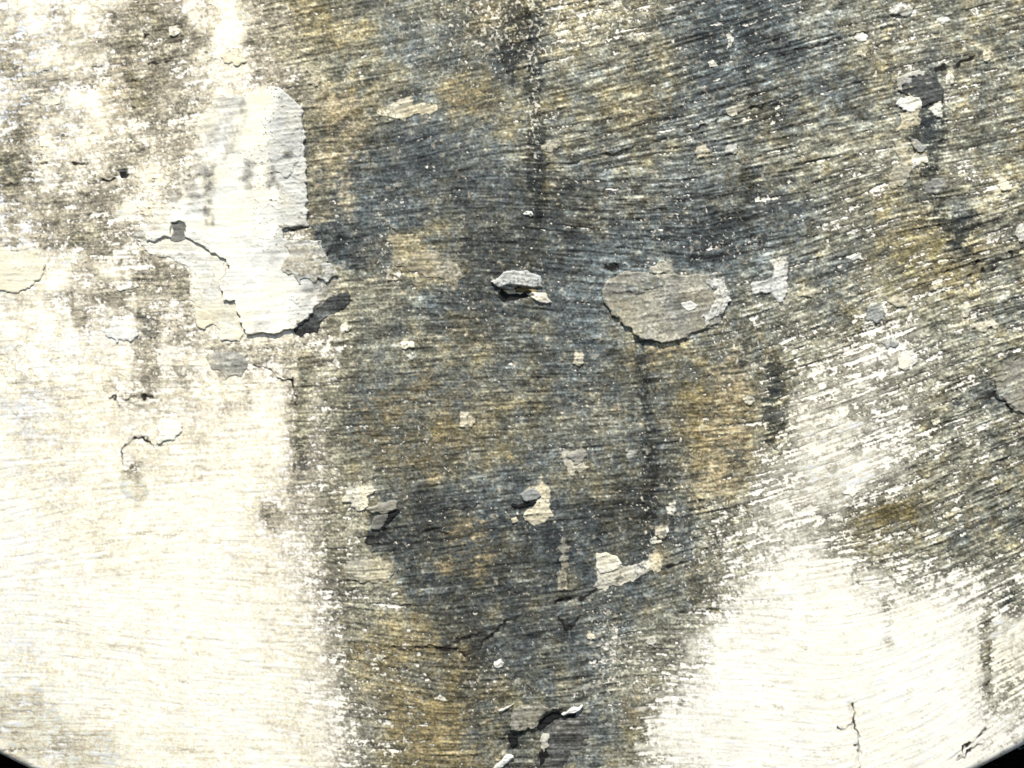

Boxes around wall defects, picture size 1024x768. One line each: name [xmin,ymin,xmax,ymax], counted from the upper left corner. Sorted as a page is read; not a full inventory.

peeling [0,244,45,293]
peeling [134,86,352,379]
spalling [491,270,552,304]
peeling [601,260,732,343]
damp [235,0,1024,768]
crack [121,436,153,463]
spalling [341,483,400,584]
spalling [511,476,554,526]
spalling [593,500,677,592]
spalling [493,701,589,768]